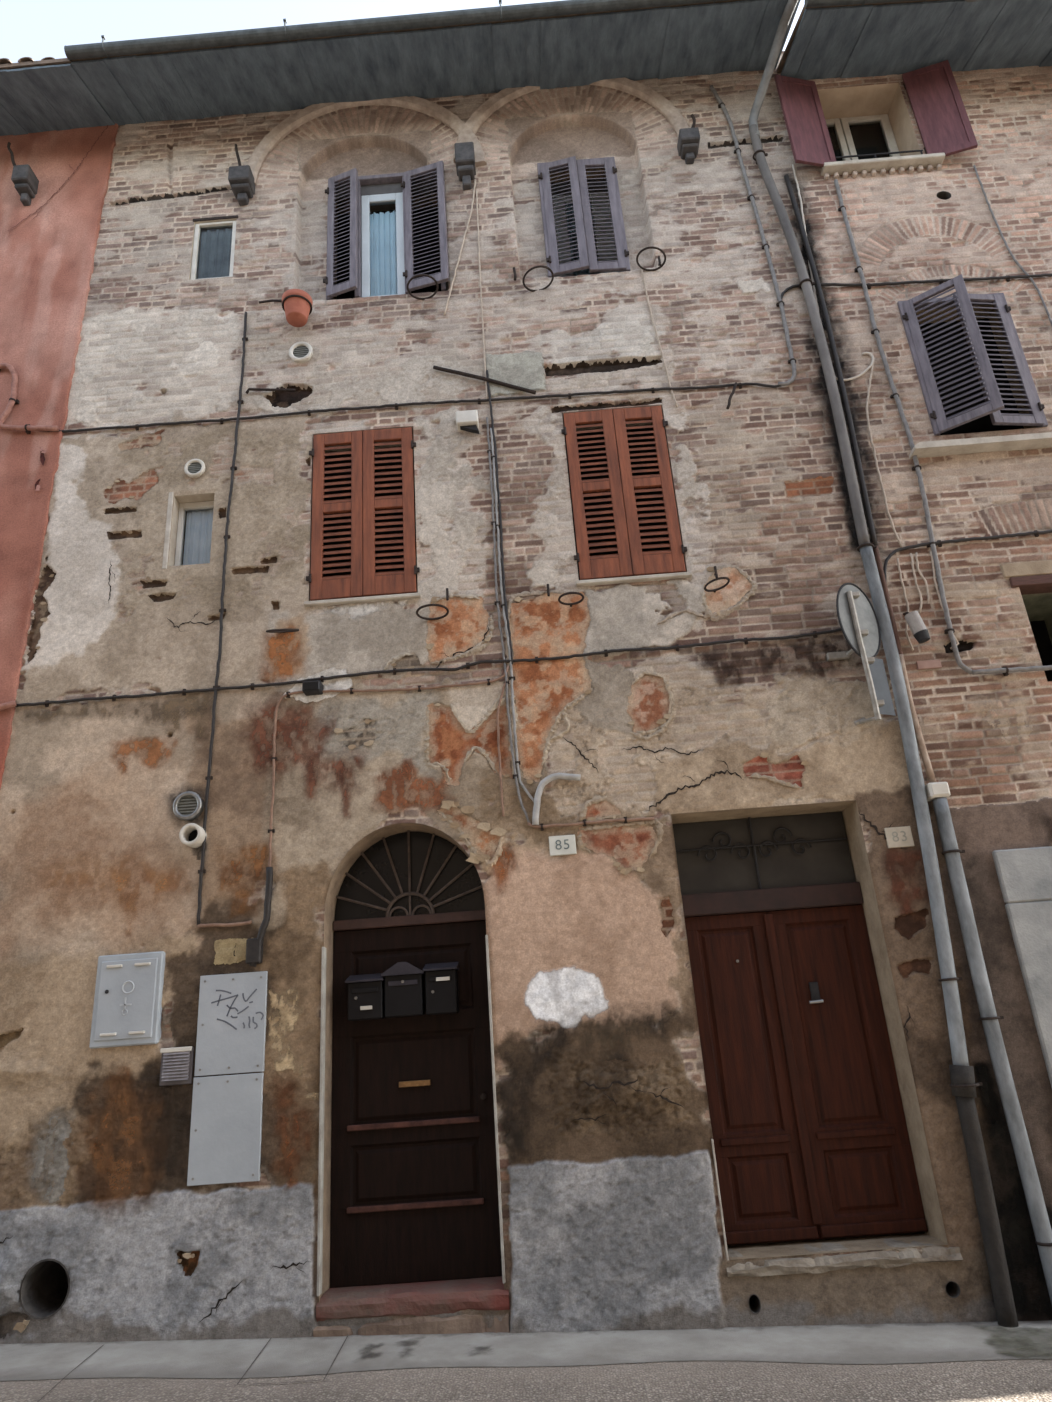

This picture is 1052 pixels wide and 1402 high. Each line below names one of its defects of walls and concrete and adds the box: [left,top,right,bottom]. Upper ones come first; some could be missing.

flaking render [264,384,312,408]
flaking render [104,469,158,514]
flaking render [107,530,142,540]
flaking render [27,557,56,663]
peeling [657,567,758,625]
peeling [383,590,593,867]
peeling [627,669,675,740]
crack [564,738,742,811]
flaking render [894,908,929,940]
damp [497,1006,671,1159]
flaking render [177,1251,200,1276]
crack [200,1261,307,1322]